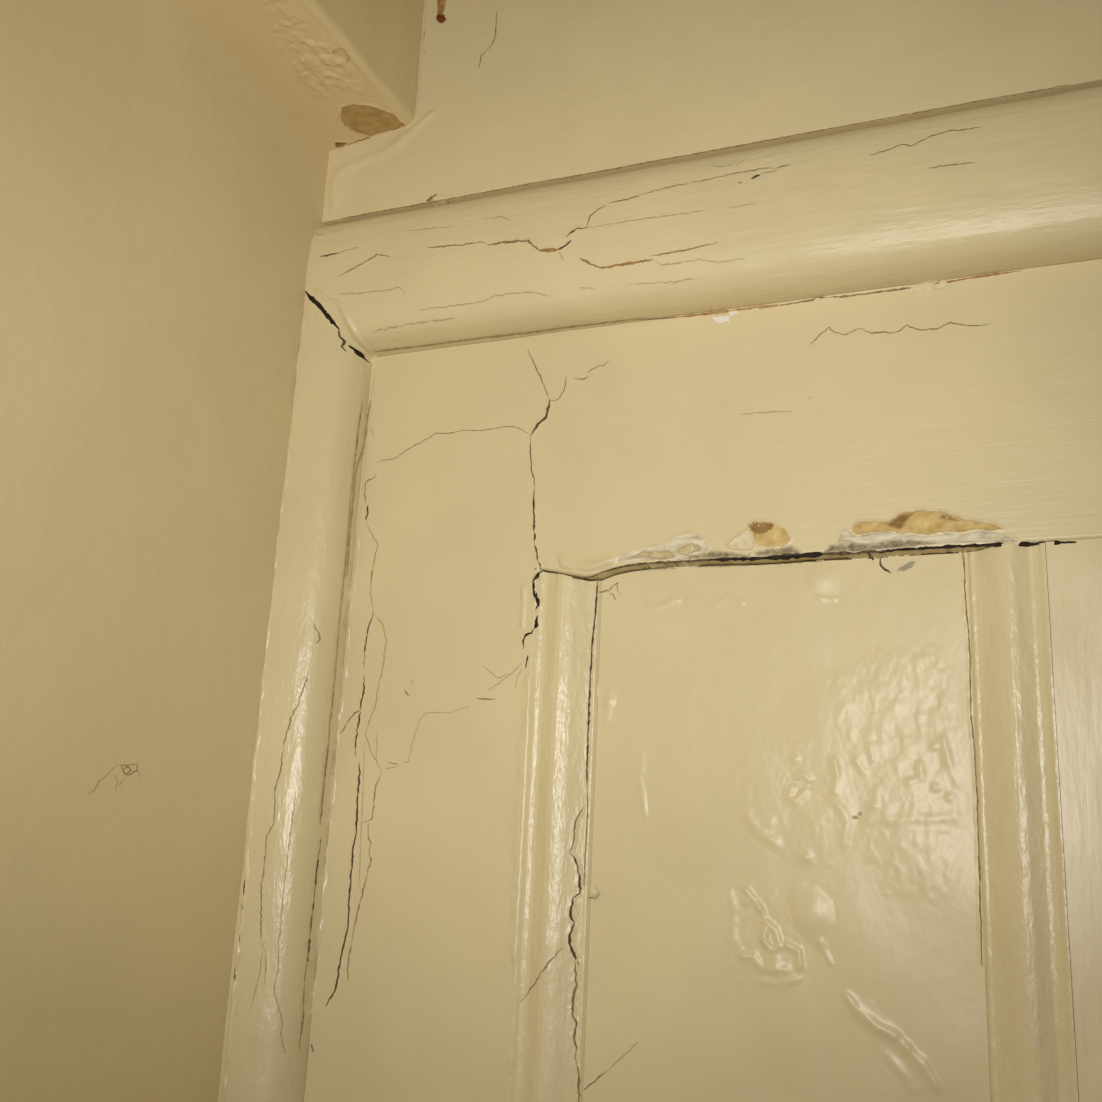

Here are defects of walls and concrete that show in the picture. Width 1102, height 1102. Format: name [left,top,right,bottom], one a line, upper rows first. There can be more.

corrosion [436,0,446,23]
peeling [332,102,408,149]
peeling [617,518,797,570]
peeling [827,507,1022,571]
crack [234,84,1070,1102]